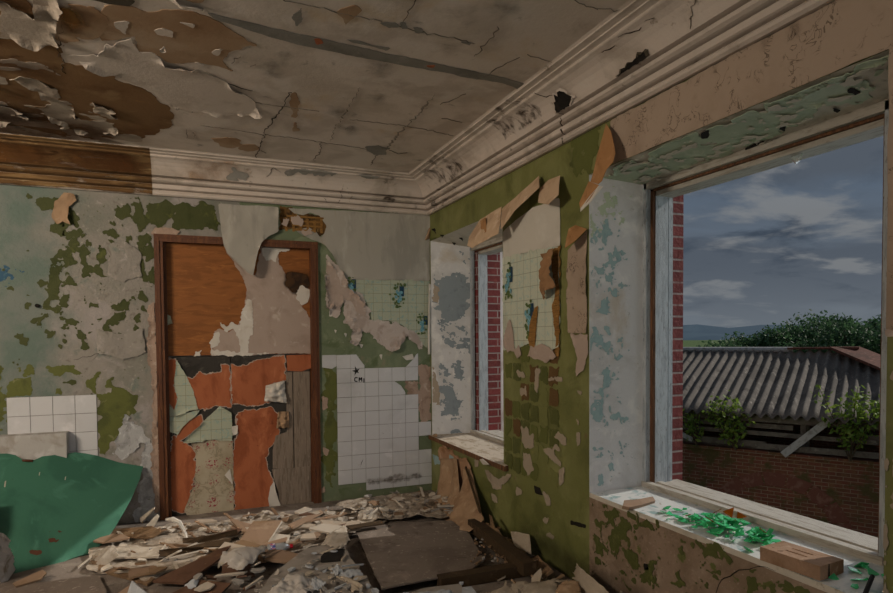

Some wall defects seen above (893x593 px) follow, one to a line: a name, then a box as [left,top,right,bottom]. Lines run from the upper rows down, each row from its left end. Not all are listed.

water stain [59,7,85,31]
crack [283,0,499,56]
peeling [0,0,263,145]
crack [186,54,551,173]
flaking render [552,88,576,114]
flaking render [615,49,649,77]
peeling [24,196,221,522]
peeling [405,228,470,434]
peeling [516,344,563,396]
peeling [520,419,581,486]
peeling [570,503,660,591]
peeling [670,539,733,593]